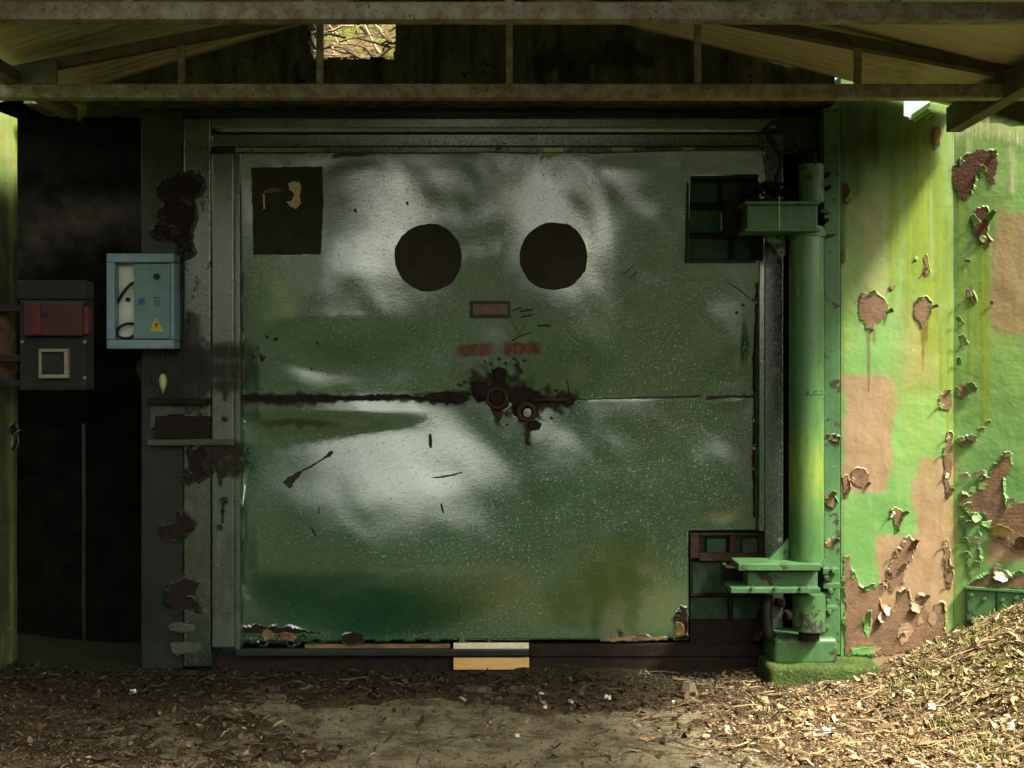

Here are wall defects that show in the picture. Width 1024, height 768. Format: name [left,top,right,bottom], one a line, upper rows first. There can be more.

peeling [148,171,207,261]
peeling [951,148,999,248]
peeling [858,285,896,331]
peeling [913,295,939,329]
rust [492,370,578,446]
peeling [157,509,198,541]
rust [199,443,248,530]
peeling [824,419,1024,657]
peeling [162,573,205,656]